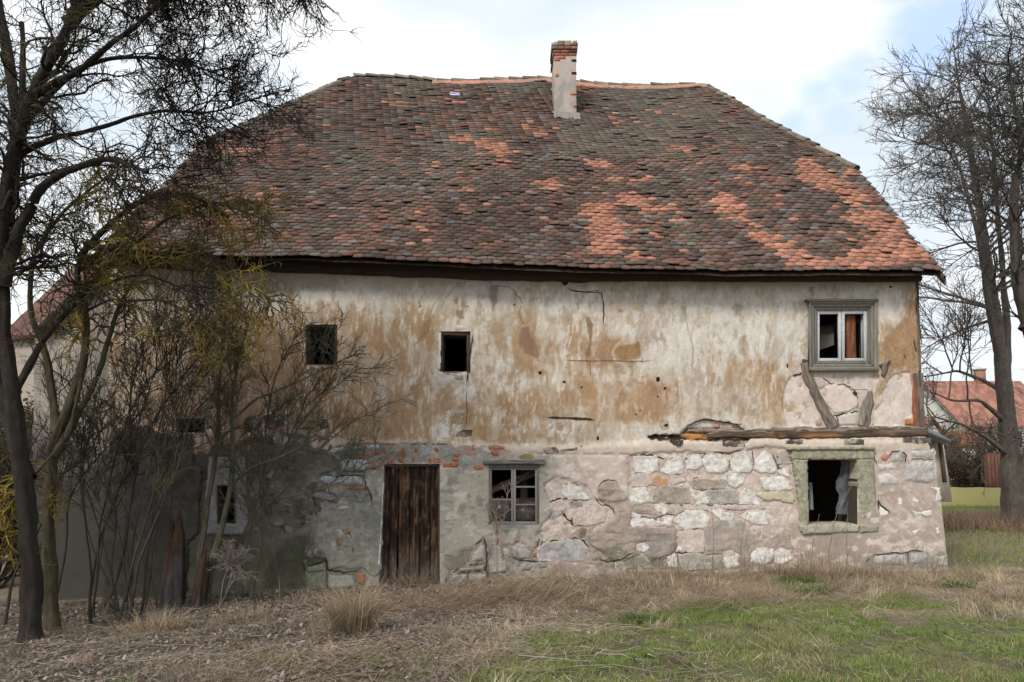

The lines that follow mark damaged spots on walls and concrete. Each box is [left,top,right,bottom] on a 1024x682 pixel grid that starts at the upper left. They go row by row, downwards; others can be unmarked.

crack [562,282,604,324]
crack [303,471,373,588]
flaking render [242,410,511,565]
crack [513,479,635,563]
flaking render [445,370,948,585]